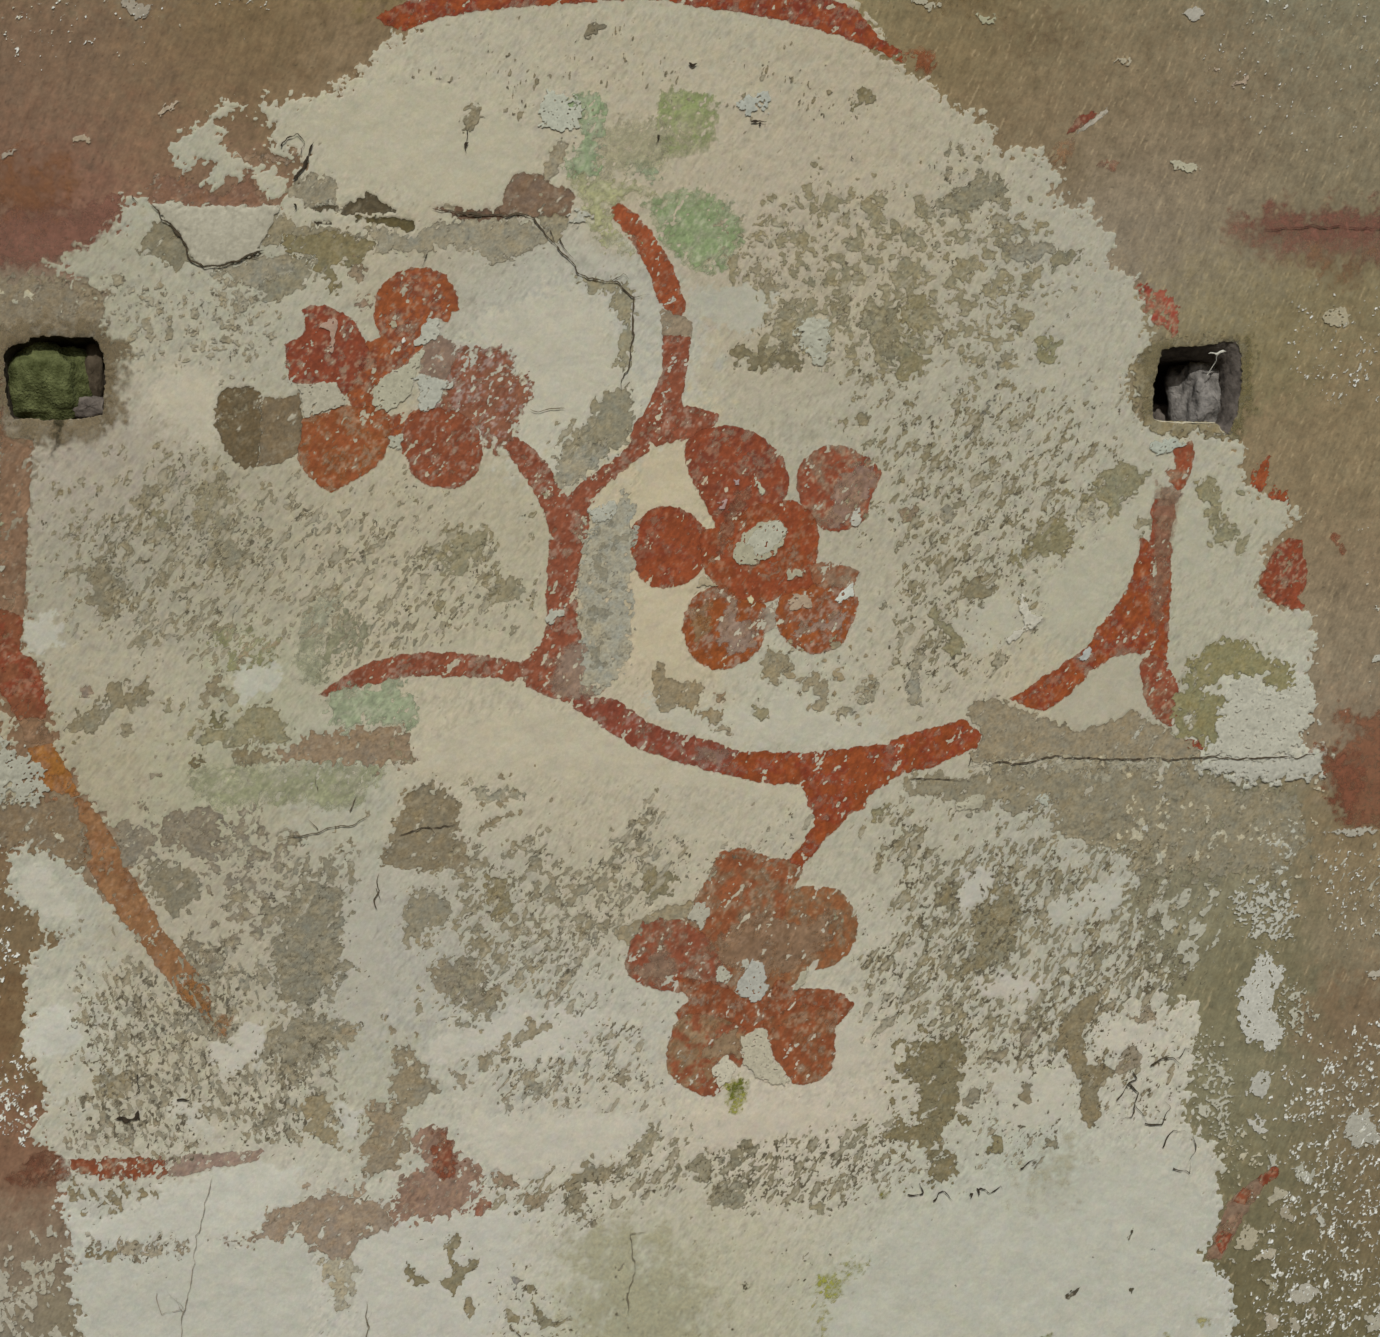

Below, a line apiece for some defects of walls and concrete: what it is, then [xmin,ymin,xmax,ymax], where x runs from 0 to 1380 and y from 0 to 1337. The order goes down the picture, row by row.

peeling [726,64,876,133]
crack [132,195,263,268]
peeling [0,22,640,781]
crack [432,208,646,391]
peeling [713,141,1258,726]
peeling [1288,294,1380,402]
peeling [0,736,93,871]
crack [913,752,1321,781]
peeling [0,882,20,983]
peeling [51,635,1380,1337]